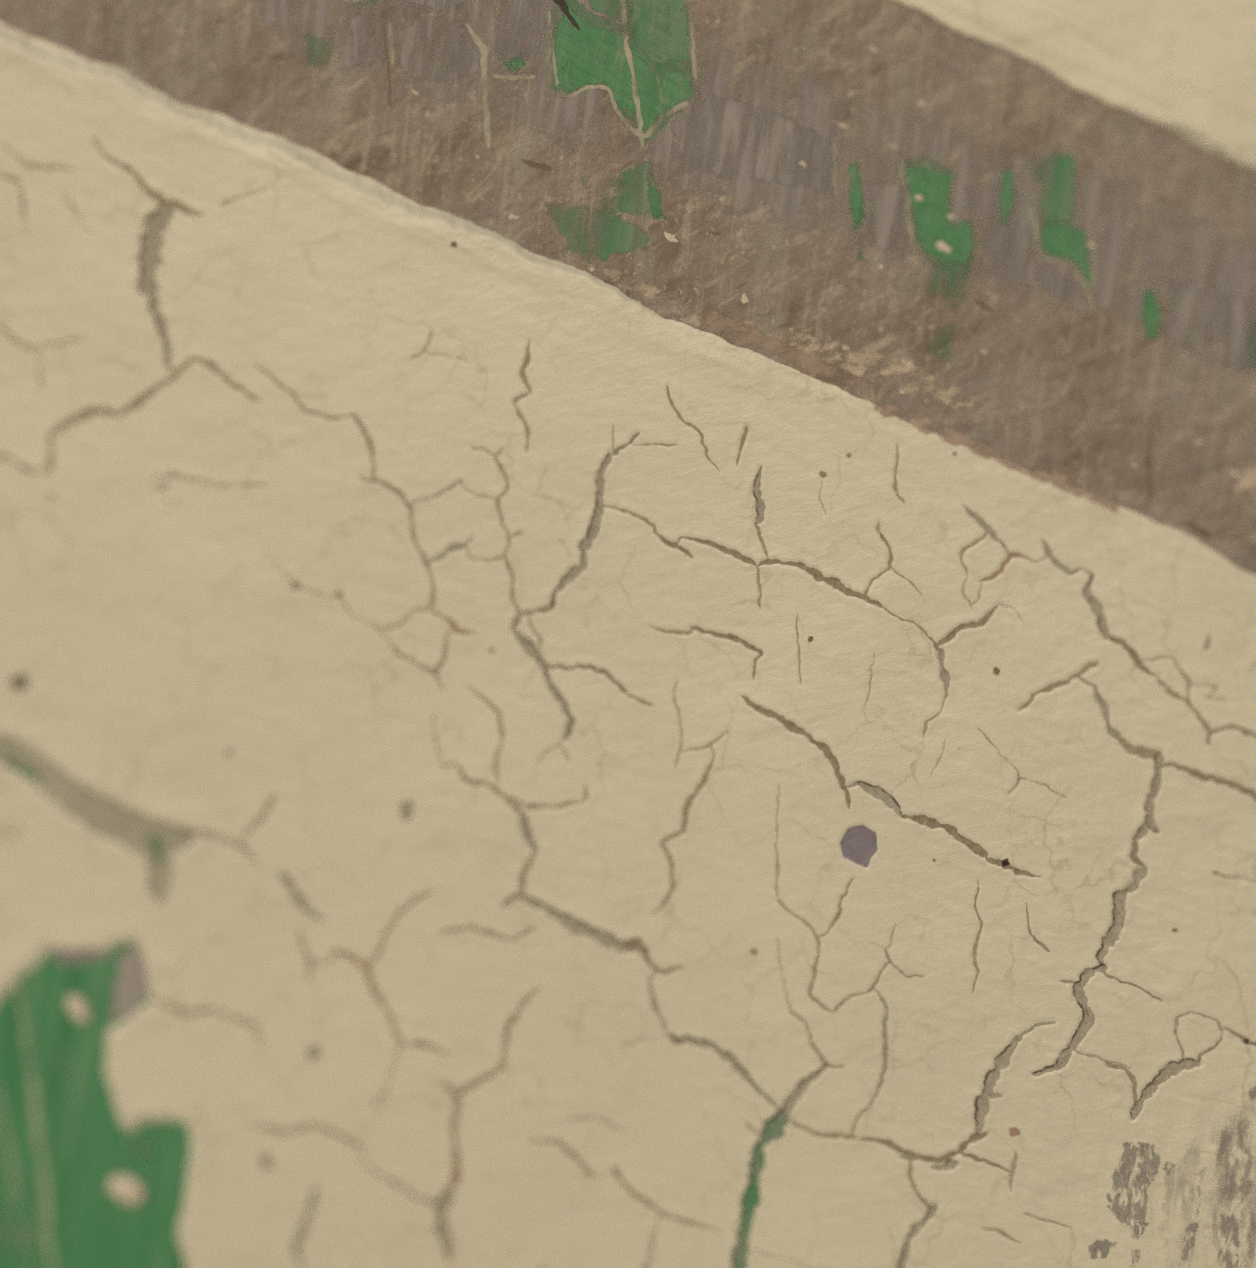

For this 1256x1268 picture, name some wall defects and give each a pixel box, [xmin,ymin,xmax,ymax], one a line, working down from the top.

crack [47,136,260,473]
crack [410,331,432,359]
peeling [936,241,952,254]
peeling [0,735,196,905]
crack [254,341,1256,1268]
peeling [0,942,190,1268]